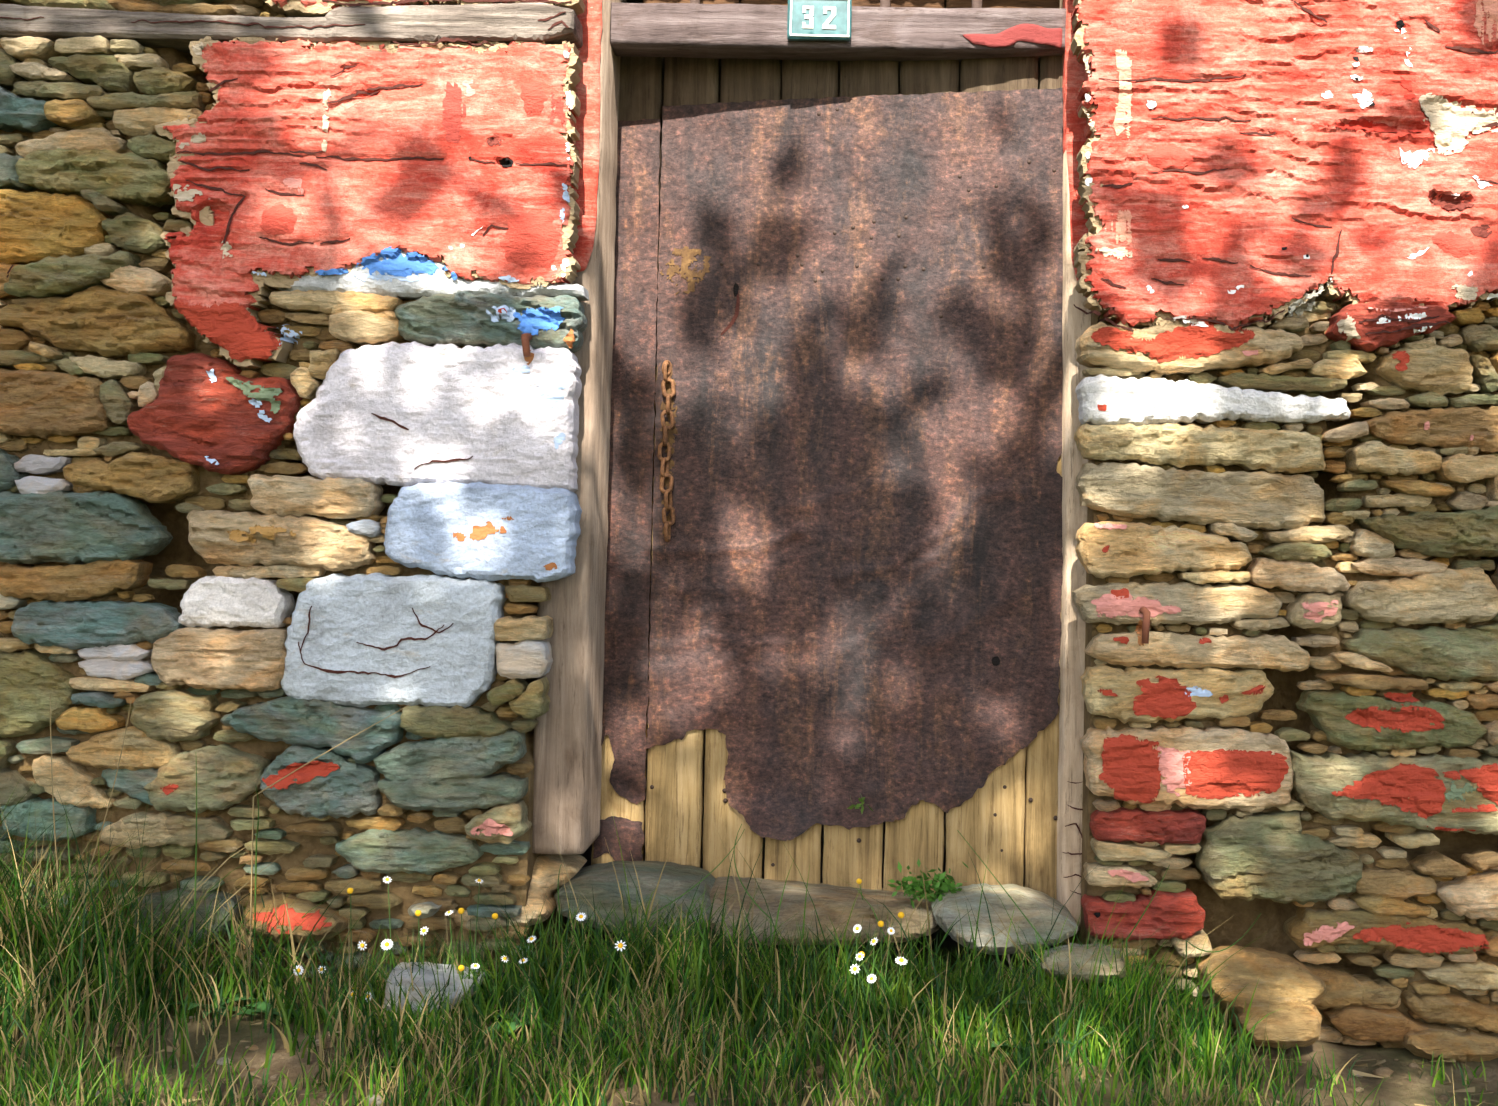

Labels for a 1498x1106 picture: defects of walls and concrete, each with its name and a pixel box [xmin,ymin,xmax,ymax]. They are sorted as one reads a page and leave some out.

spalling [1324,28,1498,169]
spalling [1429,175,1493,211]
spalling [1470,225,1492,238]
spalling [221,241,233,259]
rust [660,246,711,294]
spalling [1275,278,1333,323]
spalling [1451,271,1498,302]
peeling [1174,316,1209,327]
spalling [1337,313,1361,342]
peeling [1376,312,1432,333]
rust [659,364,678,537]
crack [298,606,454,678]